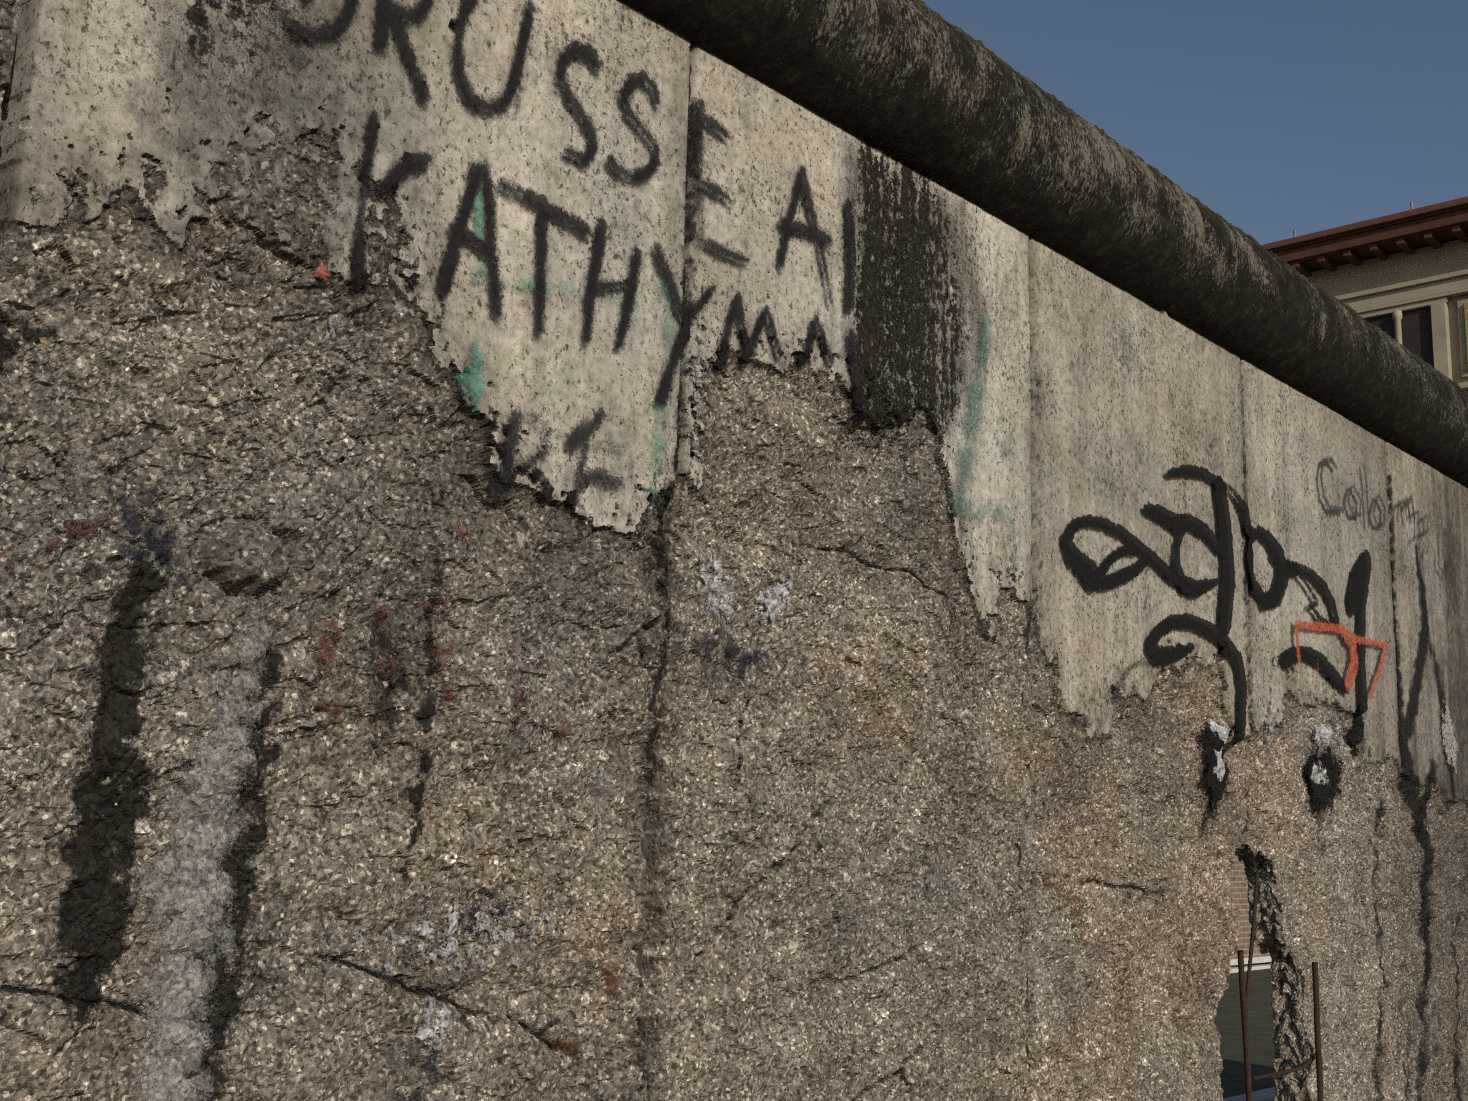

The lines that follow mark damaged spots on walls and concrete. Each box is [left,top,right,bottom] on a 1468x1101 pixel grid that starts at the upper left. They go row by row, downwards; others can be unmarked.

leakage [175,0,275,66]
leakage [848,142,981,460]
spalling [0,110,1252,1101]
leakage [638,141,809,783]
leakage [1243,527,1254,731]
leakage [628,983,649,1090]
spalling [1235,686,1468,1101]